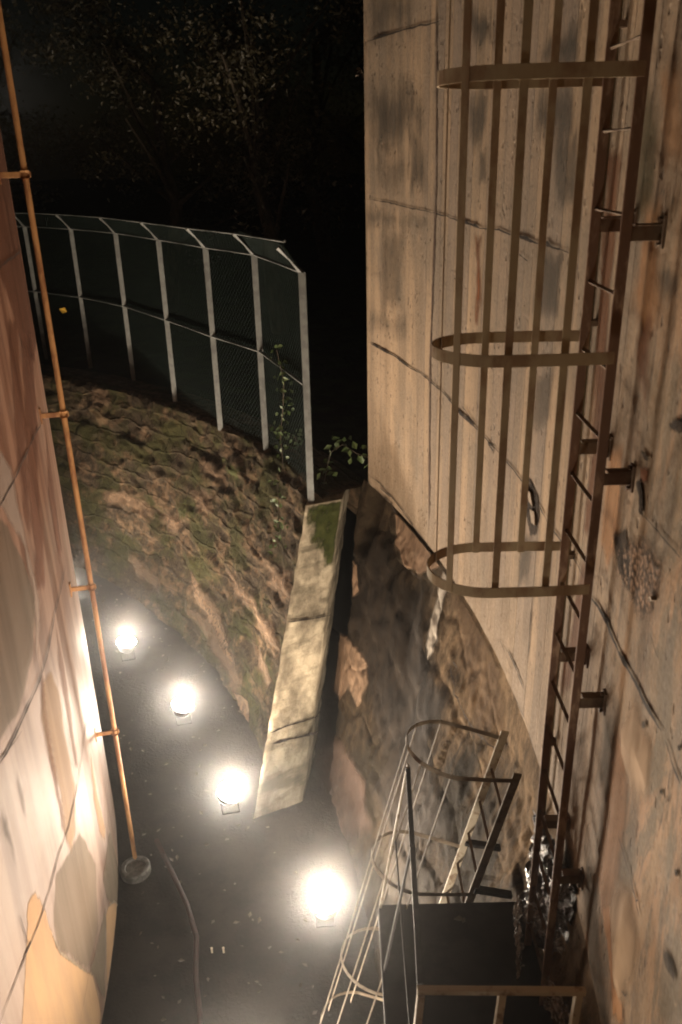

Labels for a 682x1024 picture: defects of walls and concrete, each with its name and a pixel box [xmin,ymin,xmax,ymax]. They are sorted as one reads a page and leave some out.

crack [0,571,65,763]
crack [367,13,680,832]
spalling [613,529,661,620]
crack [0,702,89,1023]